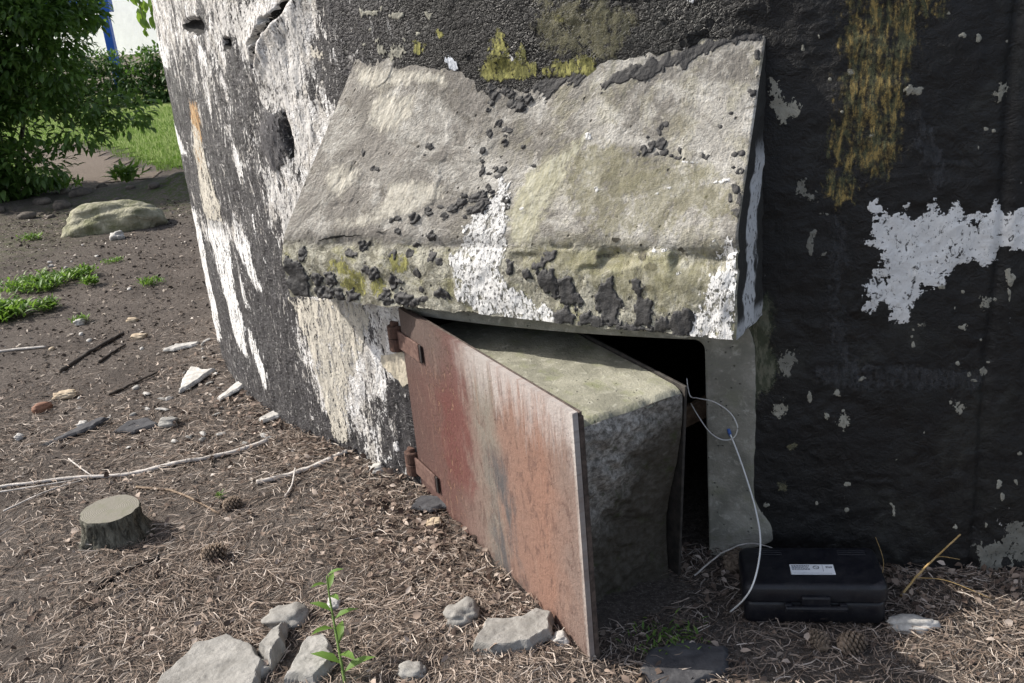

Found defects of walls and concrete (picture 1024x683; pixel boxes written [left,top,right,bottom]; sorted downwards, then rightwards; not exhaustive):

spalling [182,16,208,70]
spalling [207,1,327,174]
peeling [747,77,803,125]
spalling [258,154,299,243]
spalling [336,89,587,308]
peeling [173,120,268,394]
spalling [506,236,738,340]
peeling [861,198,1024,348]
spalling [163,341,200,351]
spalling [217,381,243,401]
peeling [955,361,990,382]
spalling [972,521,1024,570]